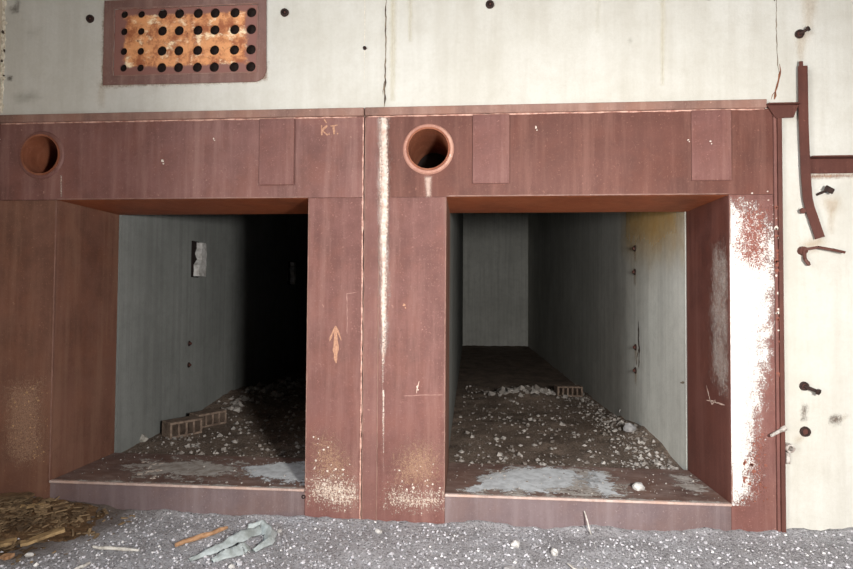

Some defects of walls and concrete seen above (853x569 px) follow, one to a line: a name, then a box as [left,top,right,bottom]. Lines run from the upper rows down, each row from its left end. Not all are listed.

water stain [379,118,388,364]